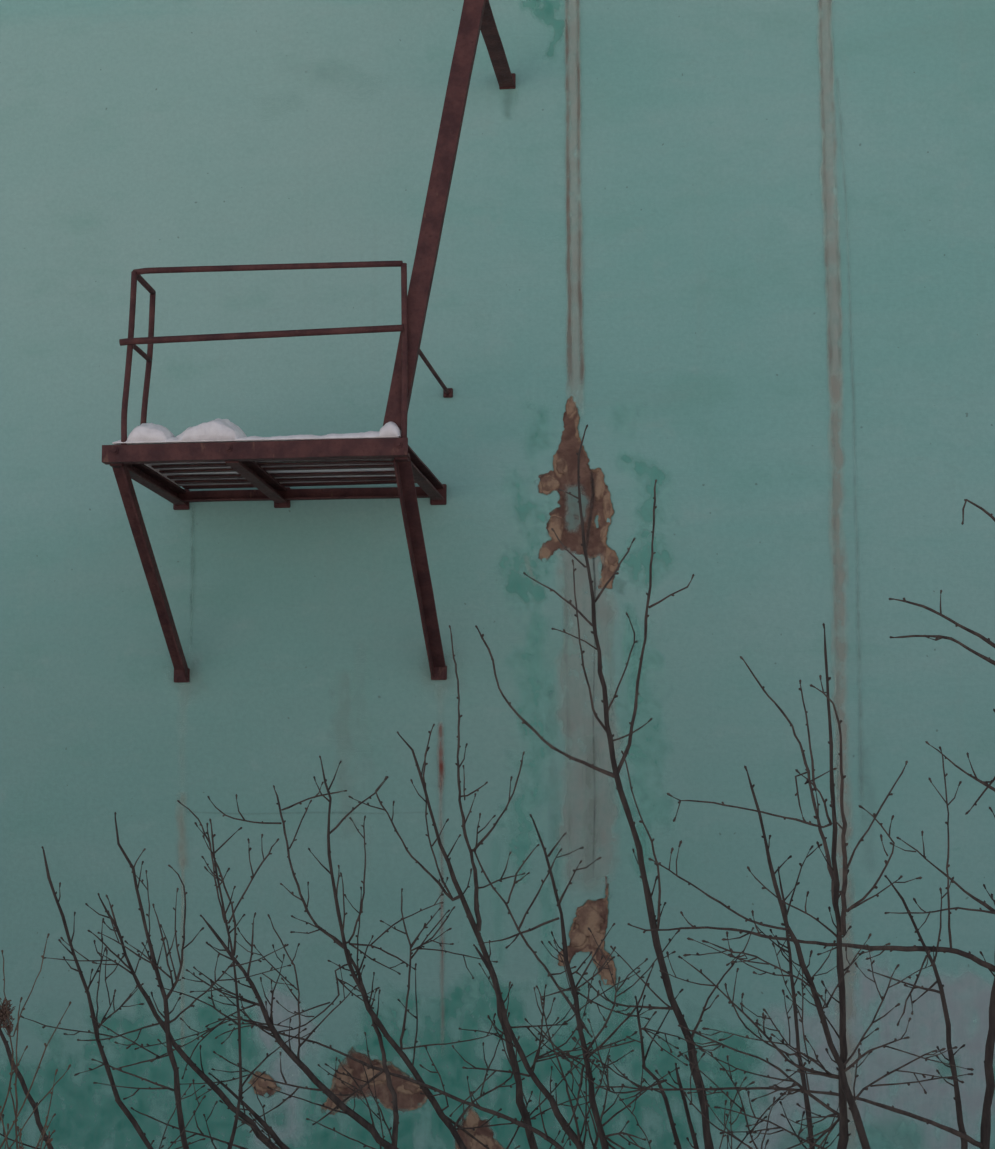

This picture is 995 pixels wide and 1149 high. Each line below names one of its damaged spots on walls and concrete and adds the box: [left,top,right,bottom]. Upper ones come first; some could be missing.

peeling [523,0,565,57]
rust [565,0,584,389]
rust [819,0,845,624]
spalling [534,396,620,589]
leakage [519,551,658,880]
rust [835,640,851,901]
spalling [557,876,616,985]
spalling [248,1071,281,1098]
spalling [321,1048,428,1115]
spalling [455,1102,504,1149]
leakage [0,969,995,1149]
rust [842,924,856,1135]